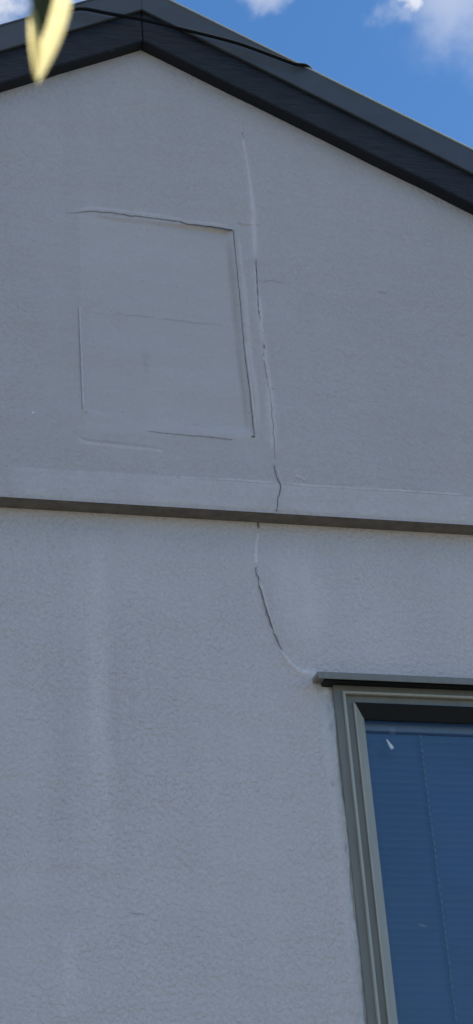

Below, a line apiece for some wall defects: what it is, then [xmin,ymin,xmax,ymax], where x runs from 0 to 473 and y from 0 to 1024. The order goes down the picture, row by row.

crack [71,211,255,449]
crack [252,465,316,679]